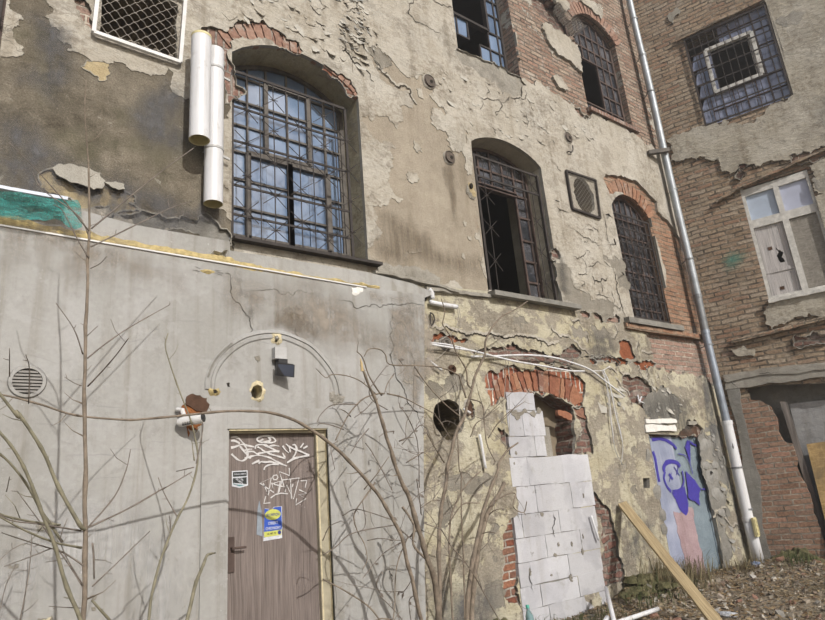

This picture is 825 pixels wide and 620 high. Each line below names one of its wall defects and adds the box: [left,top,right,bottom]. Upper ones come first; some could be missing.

flaking render [74,0,93,29]
peeling [81,60,111,81]
peeling [416,67,479,157]
flaking render [455,47,591,141]
crack [227,273,307,332]
crack [554,198,625,339]
crack [335,300,424,435]
crack [428,318,670,396]